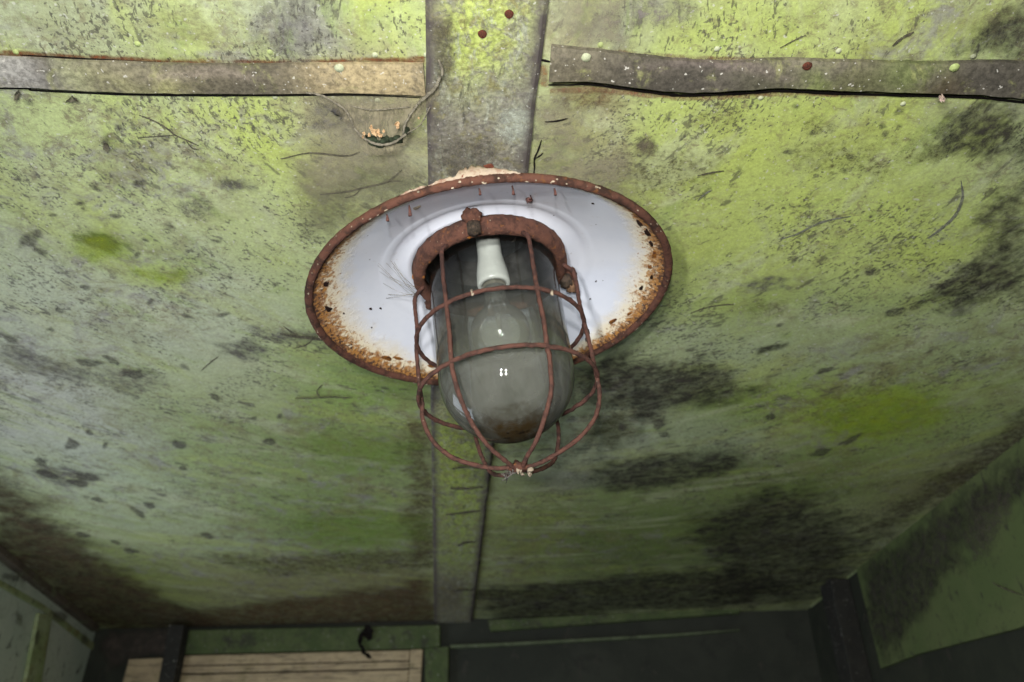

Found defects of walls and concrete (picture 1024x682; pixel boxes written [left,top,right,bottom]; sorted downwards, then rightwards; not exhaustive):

water stain [936,102,1024,157]
water stain [933,191,1024,311]
water stain [575,353,734,446]
water stain [34,458,98,487]
water stain [0,485,434,665]
water stain [476,413,1024,654]